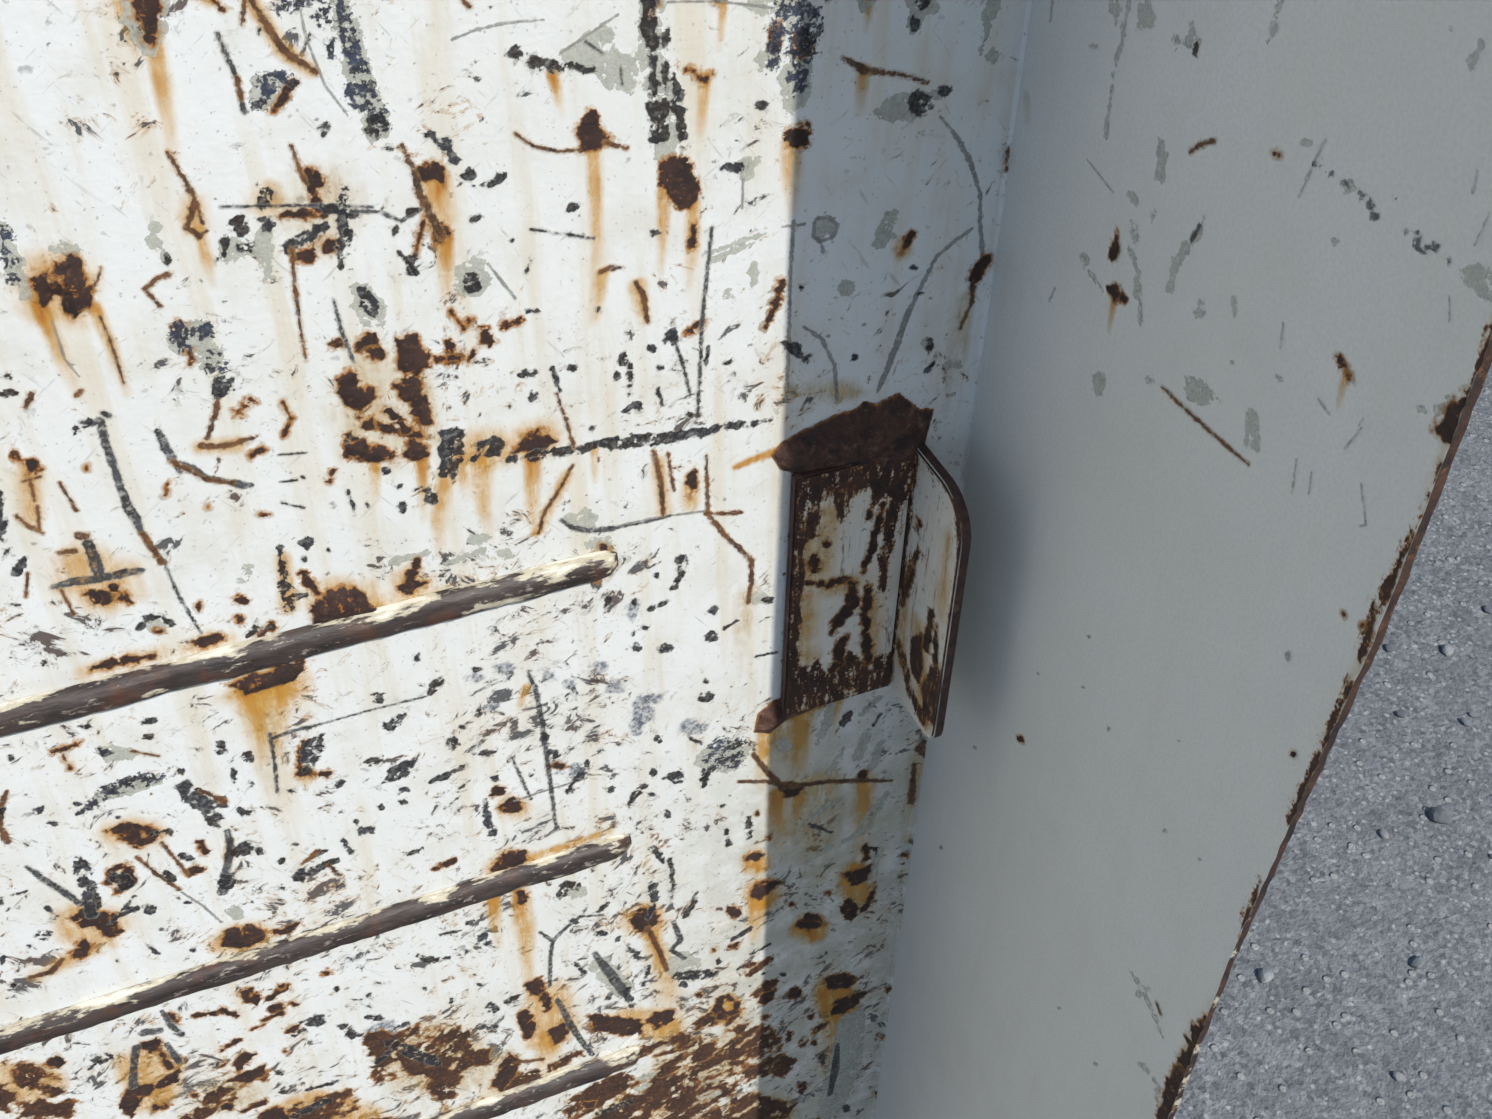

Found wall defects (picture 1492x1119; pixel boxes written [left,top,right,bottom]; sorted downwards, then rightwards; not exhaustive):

peeling [317,121,331,137]
peeling [329,0,394,151]
peeling [504,0,683,162]
peeling [744,0,815,115]
corrosion [24,240,125,384]
corrosion [278,143,454,359]
corrosion [325,299,540,517]
corrosion [190,555,378,650]
corrosion [759,452,964,760]
corrosion [103,822,300,949]
corrosion [0,1056,82,1119]
corrosion [88,942,884,1119]